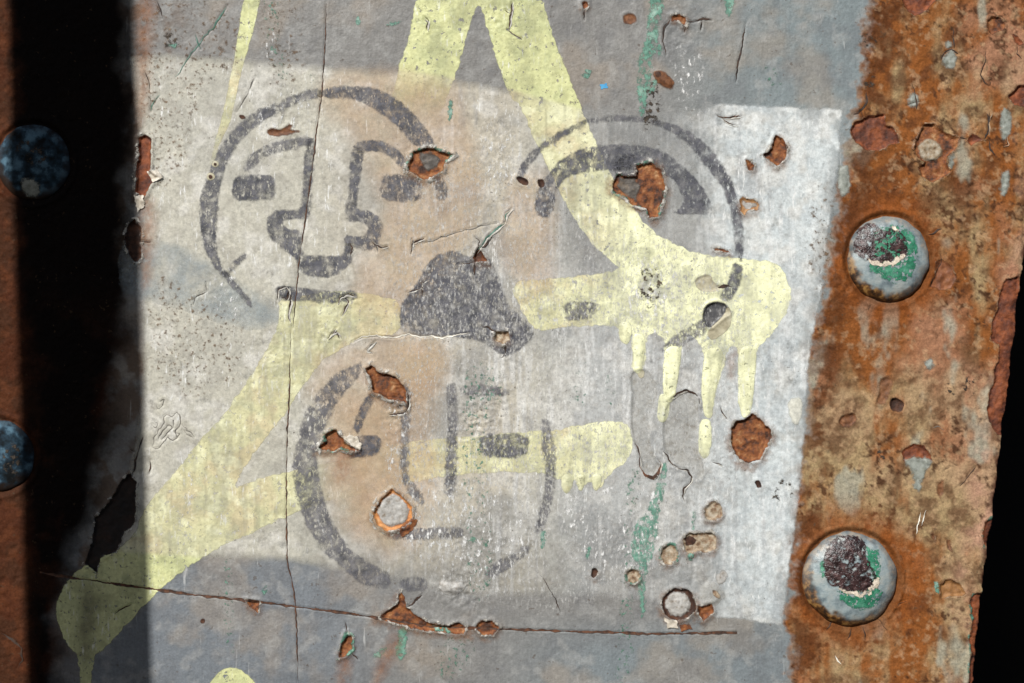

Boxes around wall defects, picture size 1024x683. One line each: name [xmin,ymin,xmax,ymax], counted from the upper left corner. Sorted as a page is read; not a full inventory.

crack [505,4,521,39]
crack [717,115,741,127]
peeling [746,135,790,170]
peeling [123,132,164,264]
peeling [609,159,668,220]
corrosion [853,223,908,263]
peeling [362,361,410,405]
crack [40,17,737,679]
peeling [987,276,1020,435]
peeling [729,412,774,464]
peeling [82,438,143,574]
corrosion [823,535,877,592]